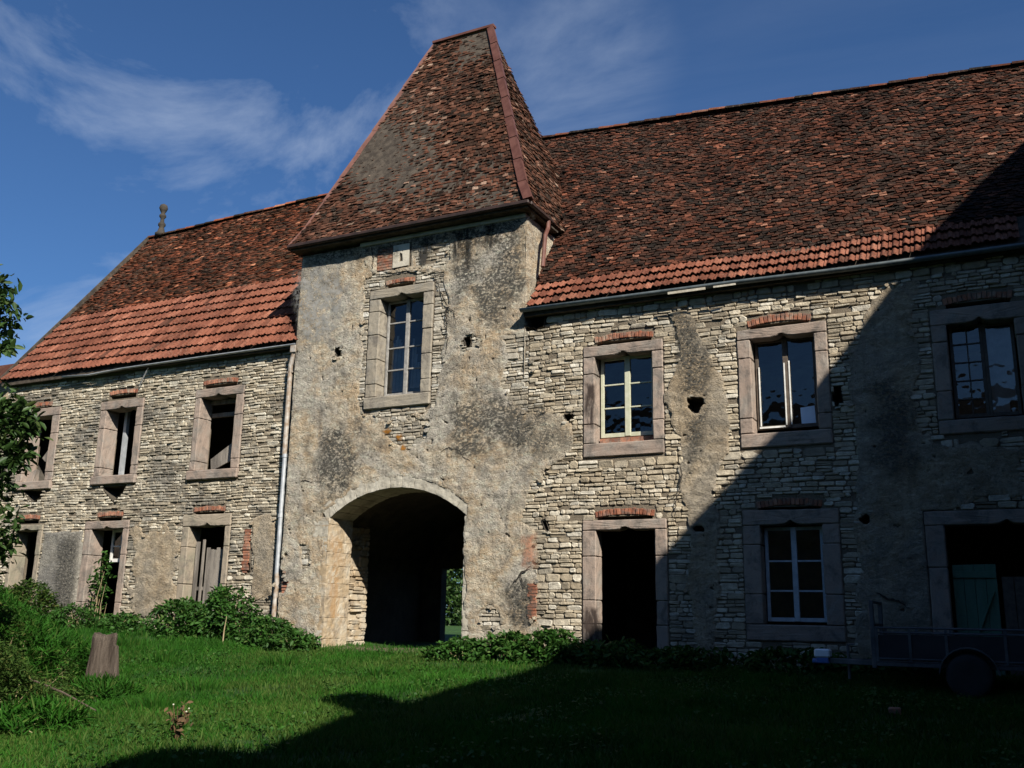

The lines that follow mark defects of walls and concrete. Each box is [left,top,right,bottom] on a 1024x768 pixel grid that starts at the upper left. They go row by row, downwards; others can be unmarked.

flaking render [357,239,484,451]
peeling [499,315,576,640]
peeling [663,310,730,656]